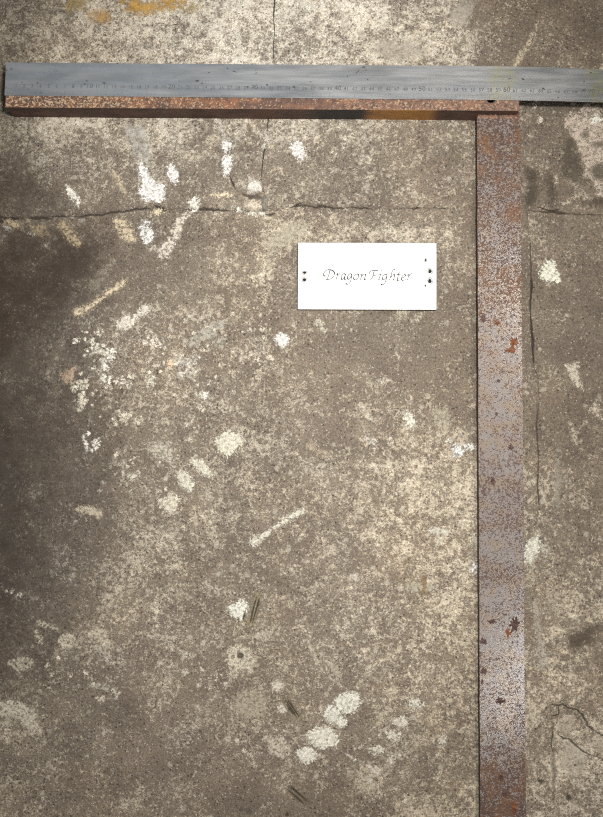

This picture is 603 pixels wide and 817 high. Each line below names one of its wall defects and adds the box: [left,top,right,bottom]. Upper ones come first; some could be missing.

crack [270,0,278,58]
crack [0,205,246,223]
crack [266,202,369,216]
crack [528,207,592,215]
crack [528,237,536,362]
crack [533,412,541,502]
crack [551,704,603,757]